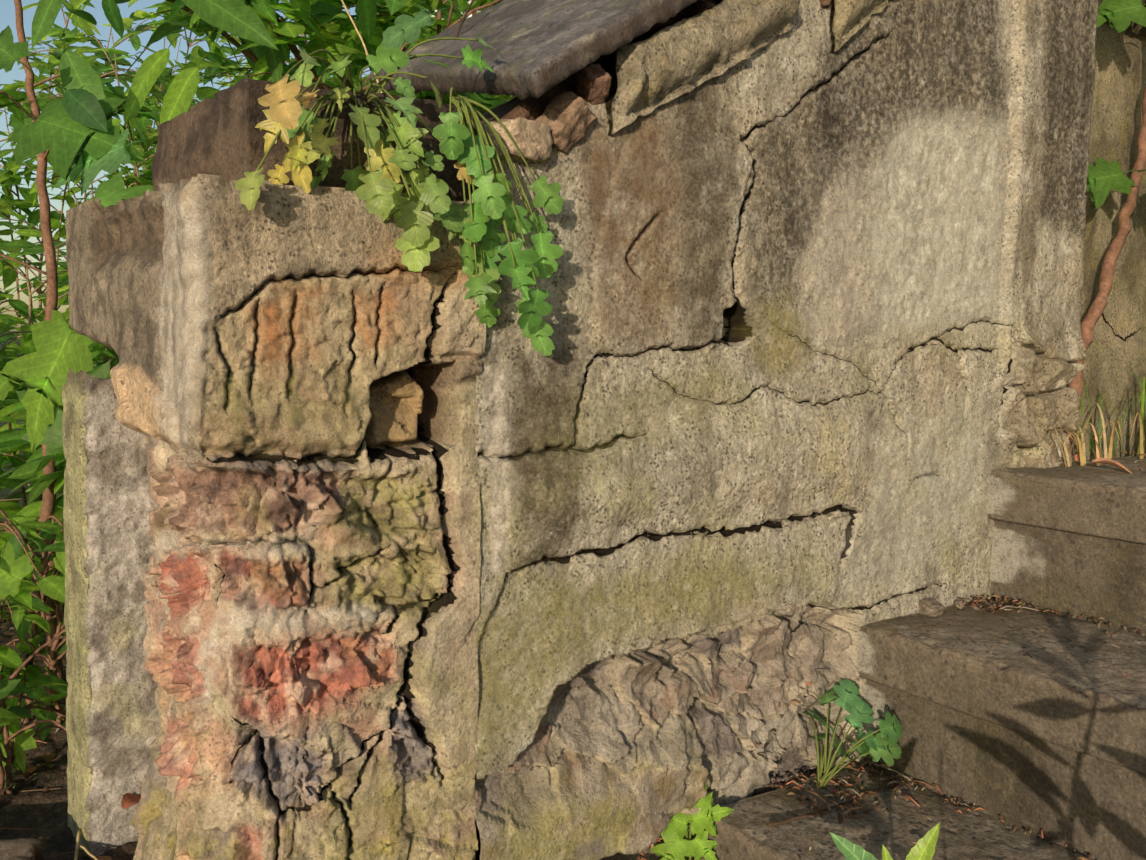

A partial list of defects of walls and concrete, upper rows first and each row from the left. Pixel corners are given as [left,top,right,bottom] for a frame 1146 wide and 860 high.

crack [477,30,1014,462]
crack [177,266,460,860]
spalling [81,257,864,860]
crack [511,504,858,572]
crack [787,583,948,658]